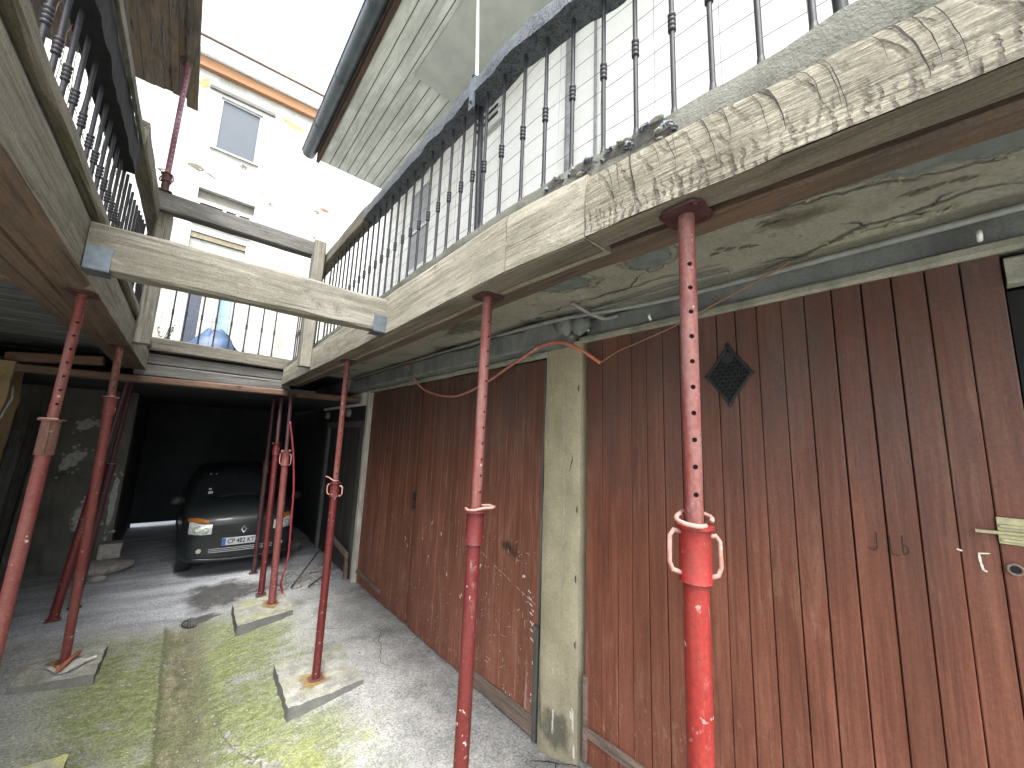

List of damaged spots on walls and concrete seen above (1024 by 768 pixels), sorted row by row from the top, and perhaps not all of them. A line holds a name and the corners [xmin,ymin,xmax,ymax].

crack [755,183,1024,274]
flaking render [55,417,101,479]
leakage [186,579,258,627]